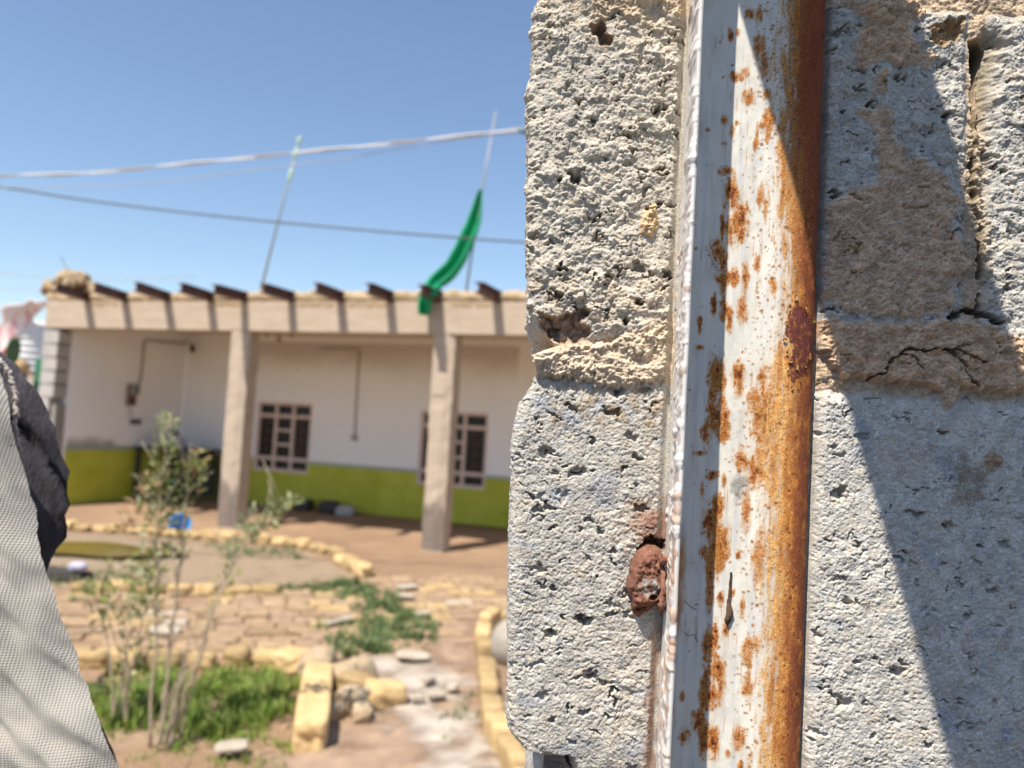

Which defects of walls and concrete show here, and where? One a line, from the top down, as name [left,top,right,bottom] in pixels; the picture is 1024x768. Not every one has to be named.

spalling [536,306,594,346]
rust [677,0,826,768]
crack [866,37,1006,389]